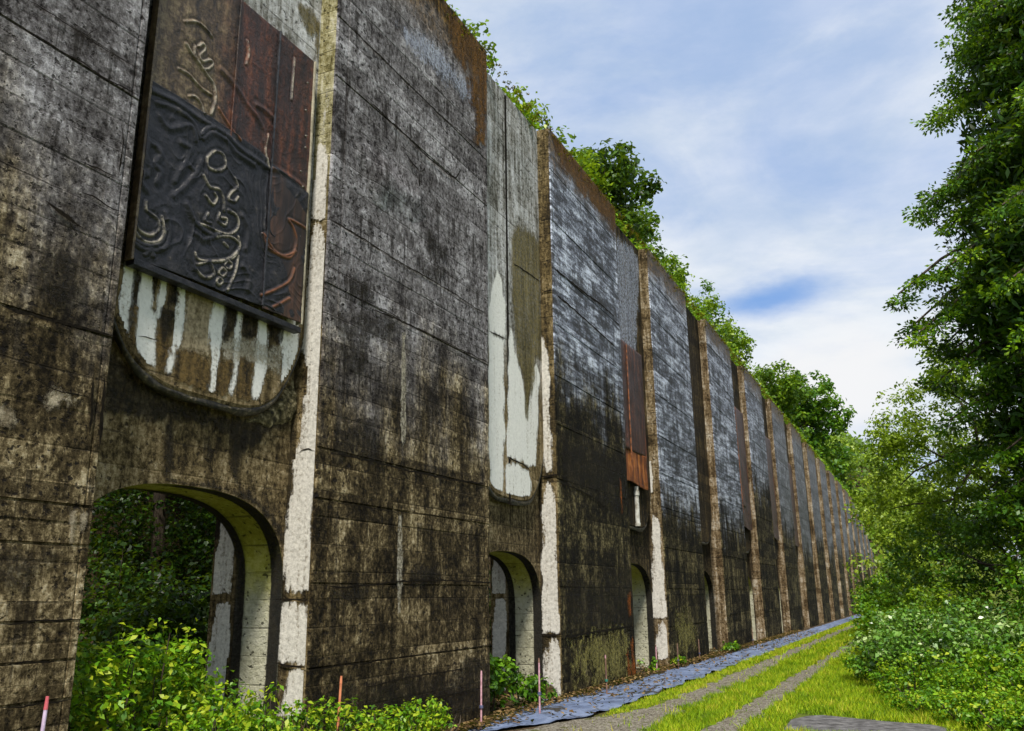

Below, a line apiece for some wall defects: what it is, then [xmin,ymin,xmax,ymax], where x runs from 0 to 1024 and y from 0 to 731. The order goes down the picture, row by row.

water stain [511,227,542,420]